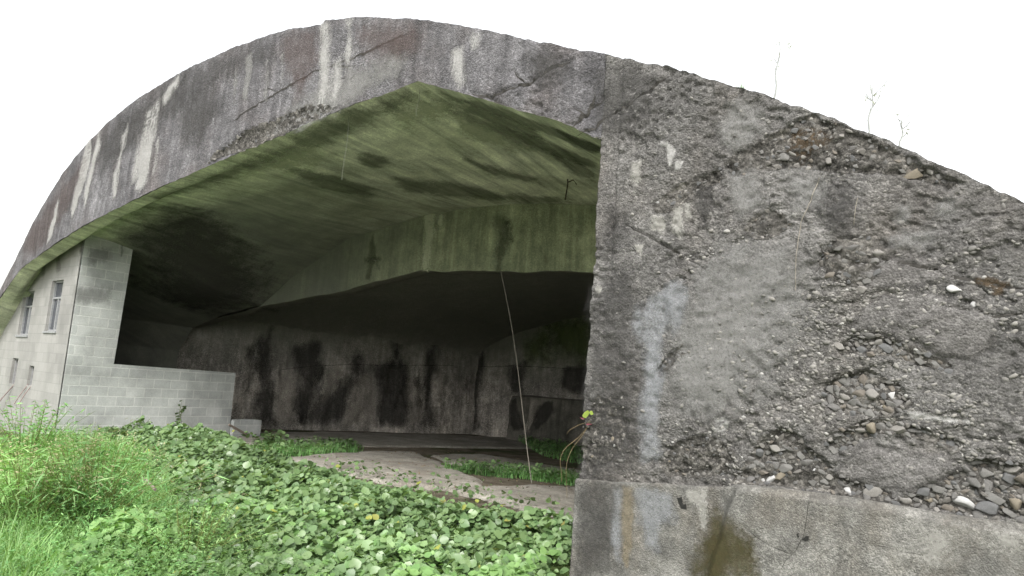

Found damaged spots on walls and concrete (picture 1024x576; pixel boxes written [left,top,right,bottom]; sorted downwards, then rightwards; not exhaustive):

damp [71,44,268,216]
spalling [208,104,335,164]
crack [234,34,406,121]
damp [157,23,601,198]
damp [396,178,571,203]
crack [473,60,573,105]
spalling [652,113,958,239]
damp [246,330,276,425]
damp [292,340,363,424]
damp [562,246,806,573]
spalling [658,371,1024,528]
spalling [834,332,953,374]